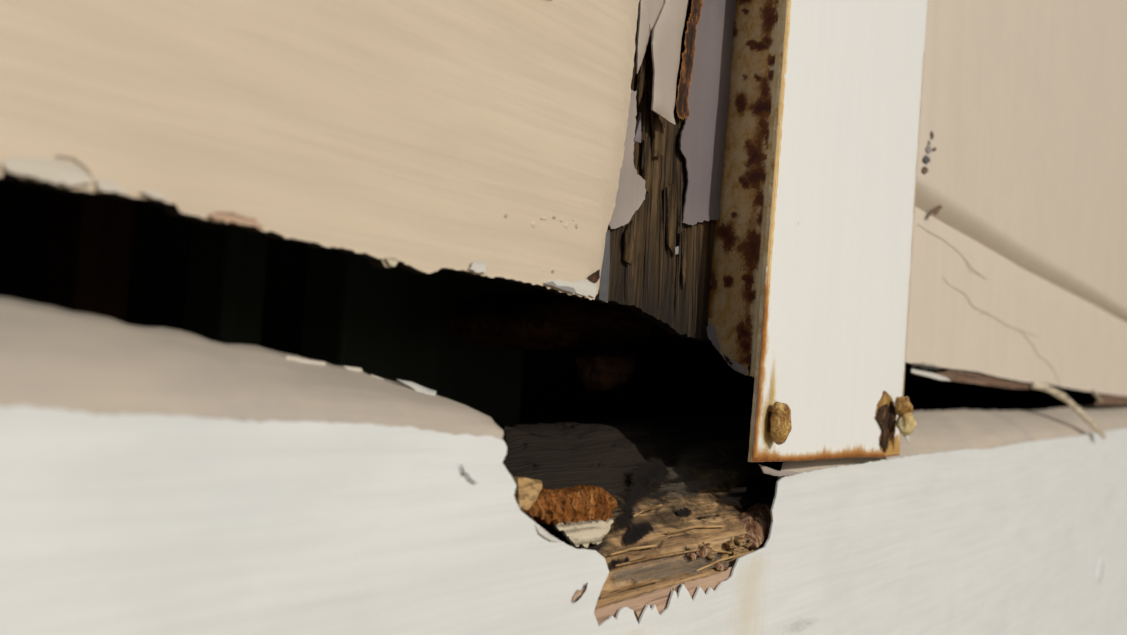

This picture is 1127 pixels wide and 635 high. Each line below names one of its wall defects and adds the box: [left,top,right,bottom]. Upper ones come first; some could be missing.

peeling [636,0,736,225]
peeling [1,155,126,194]
peeling [141,190,167,200]
peeling [209,212,264,229]
peeling [544,90,646,303]
corrosion [708,0,925,462]
peeling [469,260,487,273]
crack [919,225,1061,387]
peeling [285,355,326,365]
peeling [343,366,436,396]
spalling [610,459,685,569]
spalling [676,464,800,520]